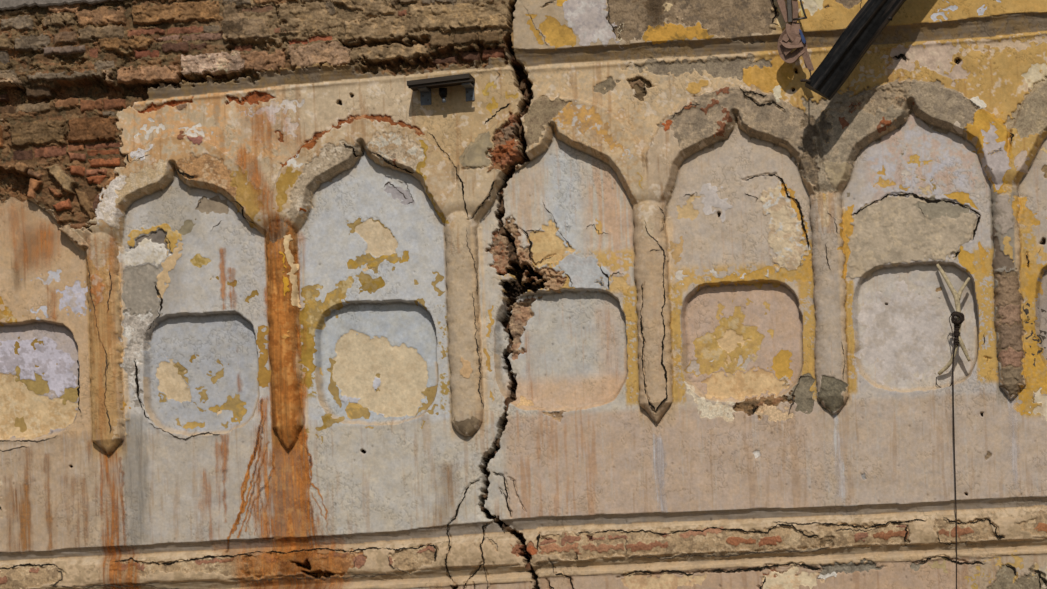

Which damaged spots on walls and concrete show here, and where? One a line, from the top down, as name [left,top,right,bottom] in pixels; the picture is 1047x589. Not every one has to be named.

crack [77,247,112,432]
corrosion [220,249,231,299]
corrosion [227,217,343,589]
crack [113,0,606,589]
spalling [0,0,1047,444]
crack [600,207,668,412]
crack [744,174,981,270]
corrosion [100,452,138,589]
spalling [511,521,910,589]
crack [578,516,1005,589]
spalling [933,518,999,543]
spalling [963,550,1047,589]